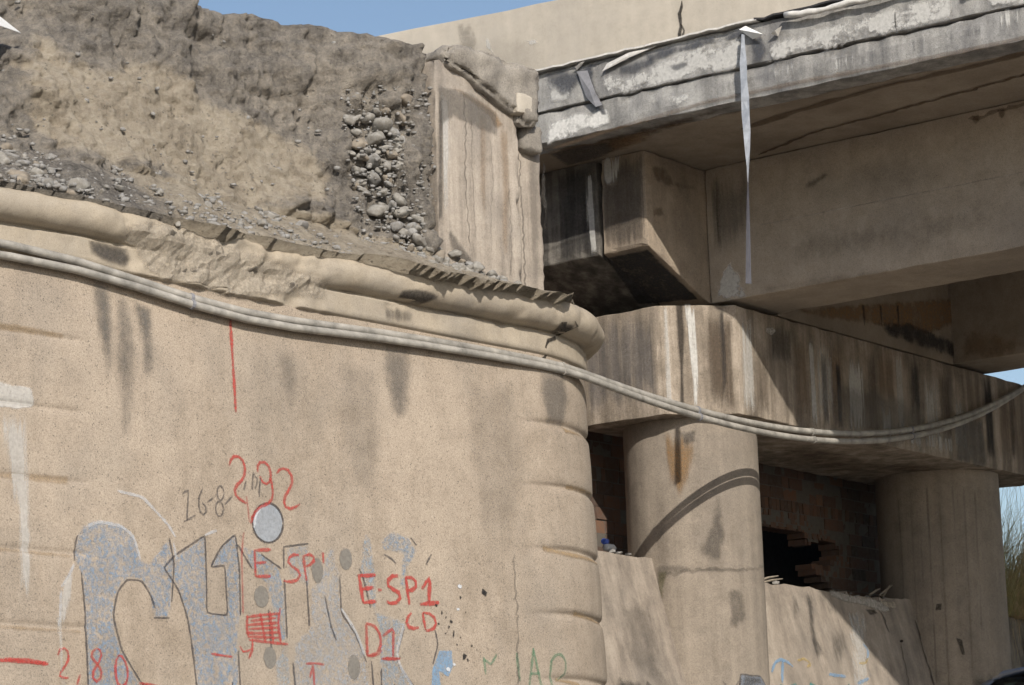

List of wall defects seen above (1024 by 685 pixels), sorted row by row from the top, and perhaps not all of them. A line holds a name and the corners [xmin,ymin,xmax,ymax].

crack [677,1,685,37]
damp [548,66,689,183]
rust [750,52,1024,155]
damp [559,173,596,257]
damp [91,242,128,264]
spalling [127,223,325,297]
damp [719,266,744,298]
damp [98,288,109,346]
damp [137,307,150,356]
rust [667,439,690,489]